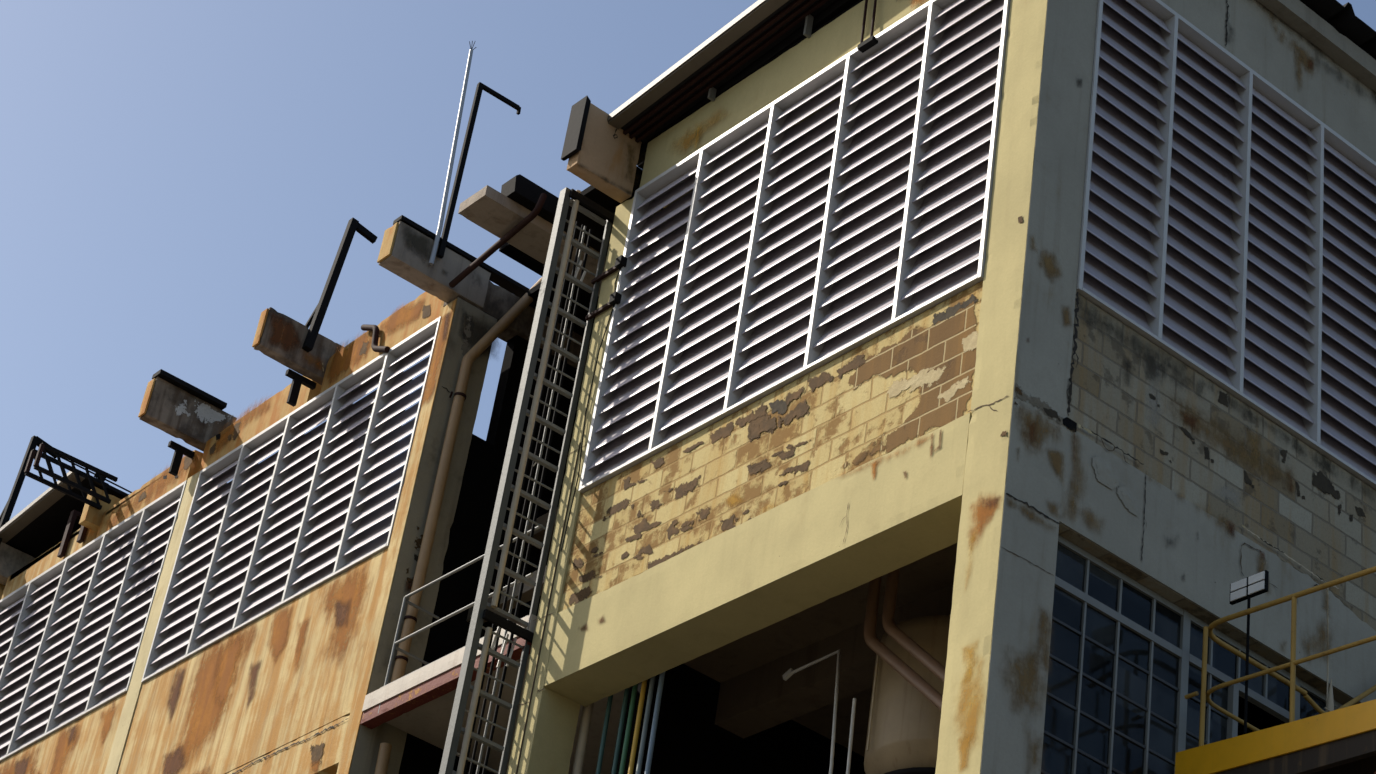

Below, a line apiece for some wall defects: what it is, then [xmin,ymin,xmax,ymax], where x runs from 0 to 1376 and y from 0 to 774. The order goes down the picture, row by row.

corrosion [309,333,372,383]
corrosion [385,301,451,403]
peeling [683,294,979,468]
spalling [108,398,269,528]
peeling [602,457,751,569]
peeling [747,440,811,486]
damp [1313,457,1354,499]
corrosion [325,569,365,660]
peeling [569,547,603,606]
corrosion [0,727,79,774]
corrosion [163,609,308,774]
corrosion [959,648,982,769]